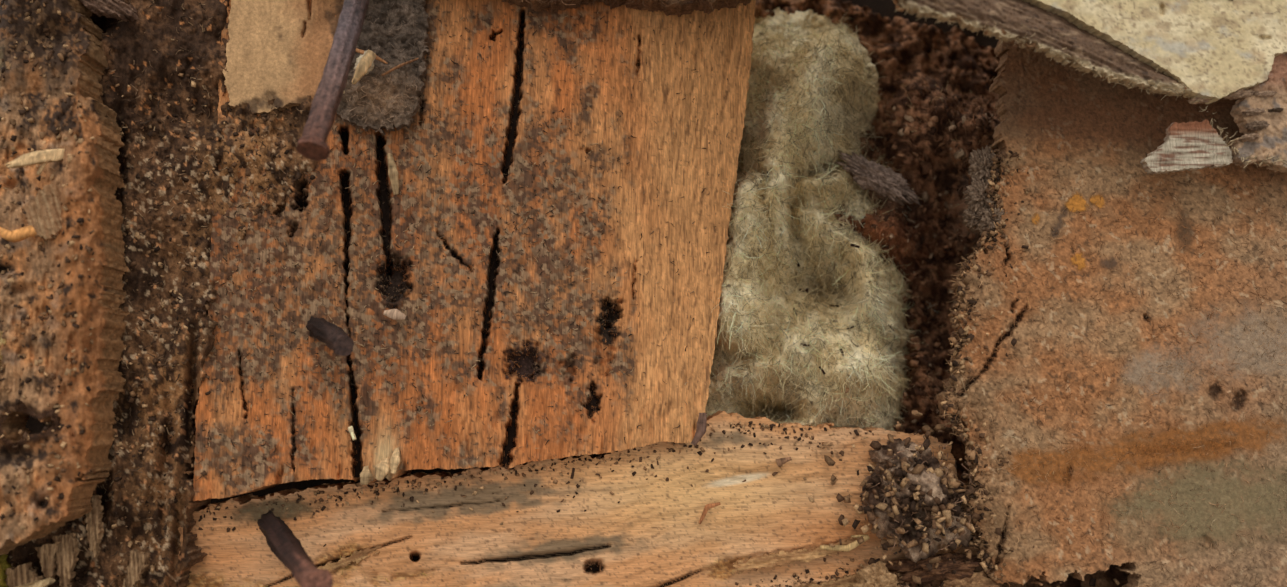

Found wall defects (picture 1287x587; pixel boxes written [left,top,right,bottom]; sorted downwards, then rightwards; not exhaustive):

crack [502,12,525,184]
peeling [1187,53,1287,173]
rust [1066,193,1104,212]
crack [441,232,500,380]
crack [347,354,363,487]
crack [500,385,518,467]